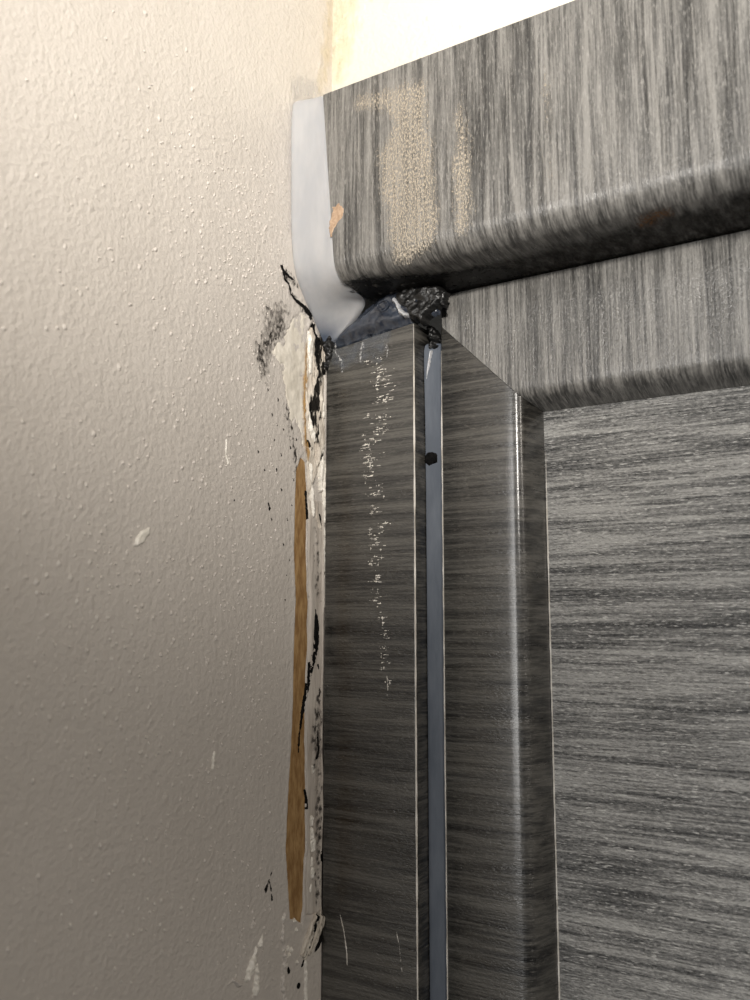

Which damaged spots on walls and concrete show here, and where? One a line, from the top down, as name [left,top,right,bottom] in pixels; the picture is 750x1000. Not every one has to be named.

damp [256,306,285,375]
crack [280,265,326,450]
peeling [272,312,326,967]